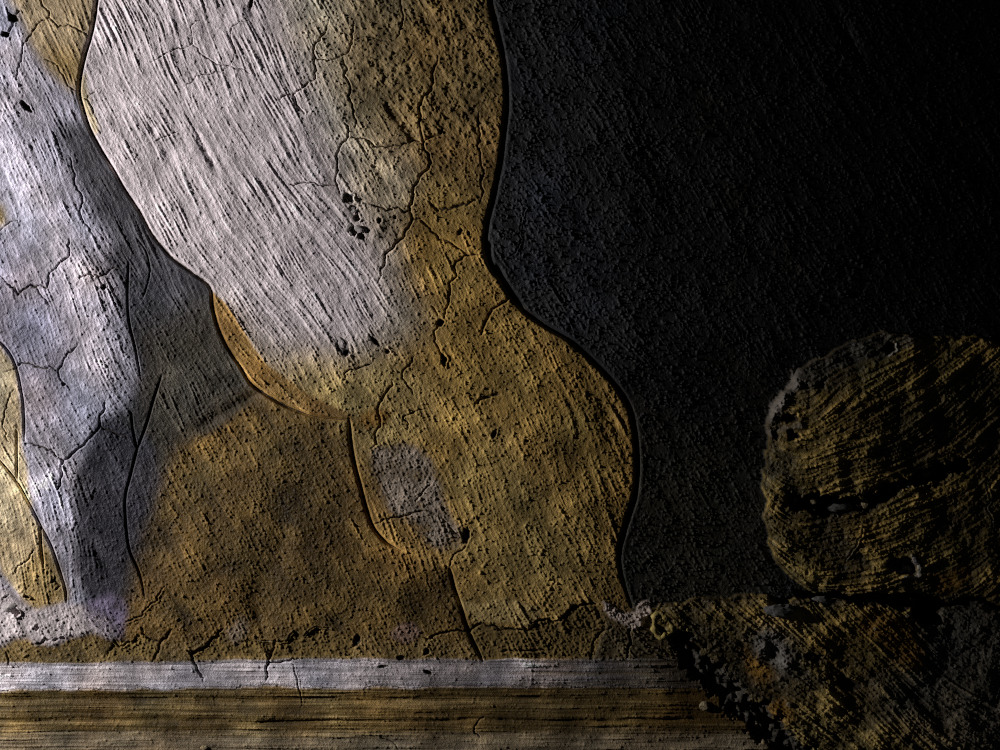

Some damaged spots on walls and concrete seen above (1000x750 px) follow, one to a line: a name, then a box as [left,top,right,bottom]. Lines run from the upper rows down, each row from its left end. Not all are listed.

crack [278,0,485,370]
crack [0,155,115,307]
crack [481,299,508,334]
crack [2,342,127,490]
crack [370,356,418,449]
spalling [772,413,801,441]
spalling [886,554,922,579]
crack [266,640,303,708]
crack [425,623,480,640]
crack [591,627,632,659]